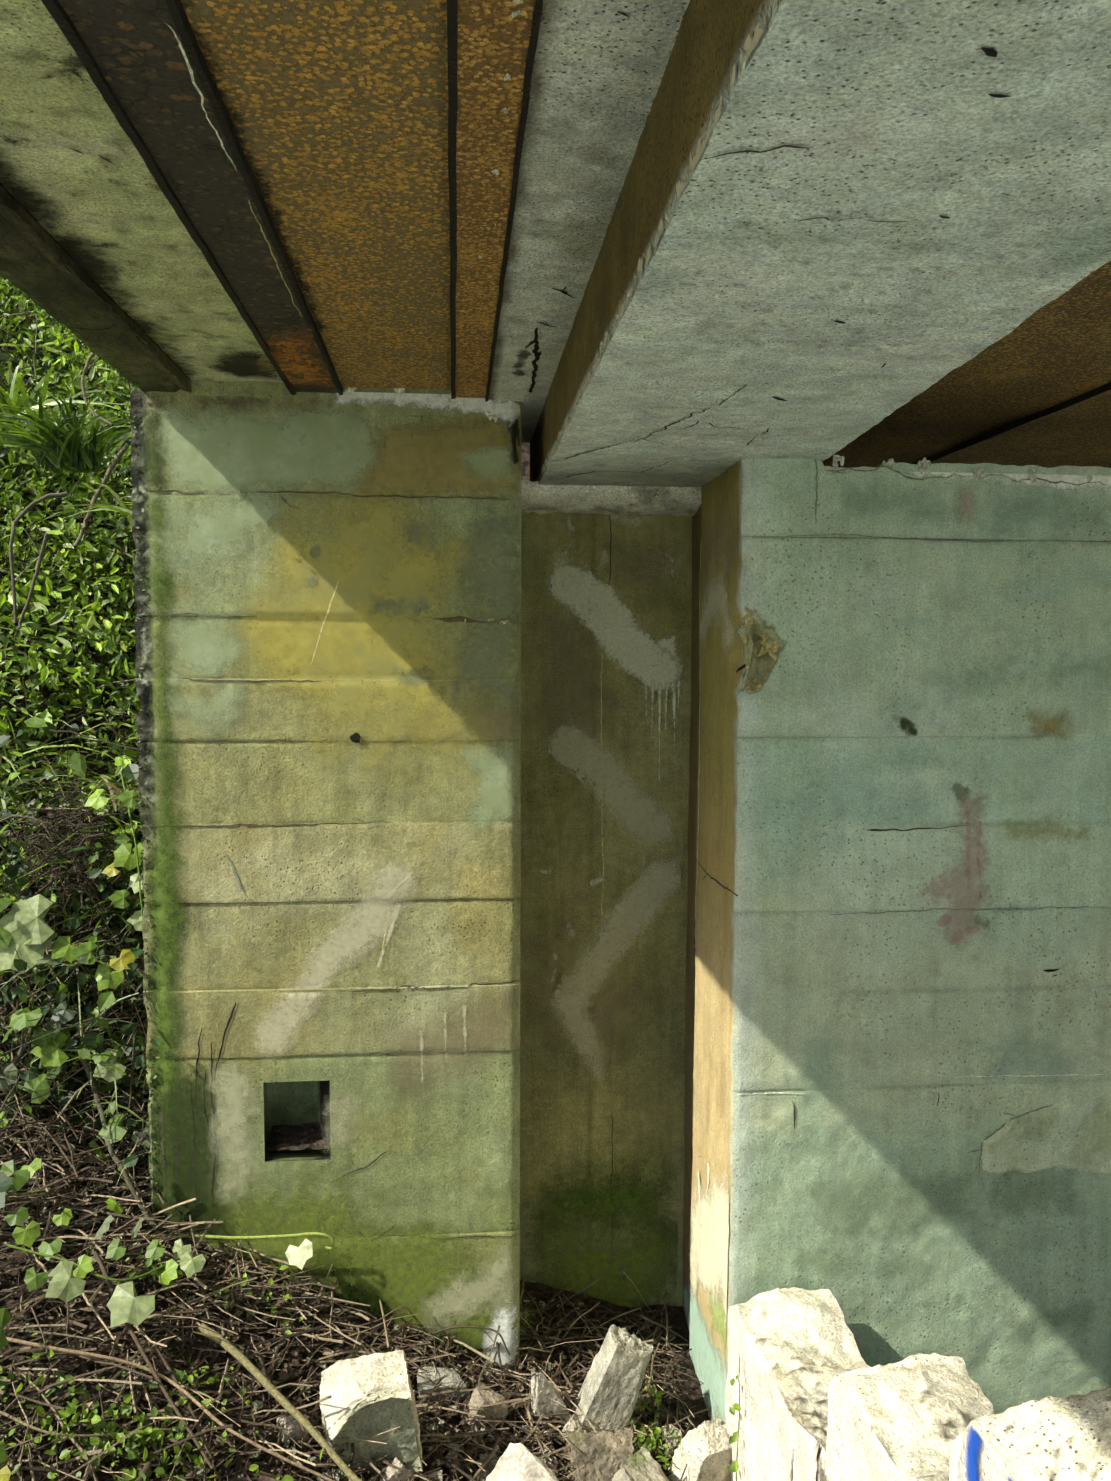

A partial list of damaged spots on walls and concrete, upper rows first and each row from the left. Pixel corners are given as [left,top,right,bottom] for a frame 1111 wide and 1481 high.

damp [0,161,279,379]
corrosion [180,0,451,390]
crack [546,384,769,481]